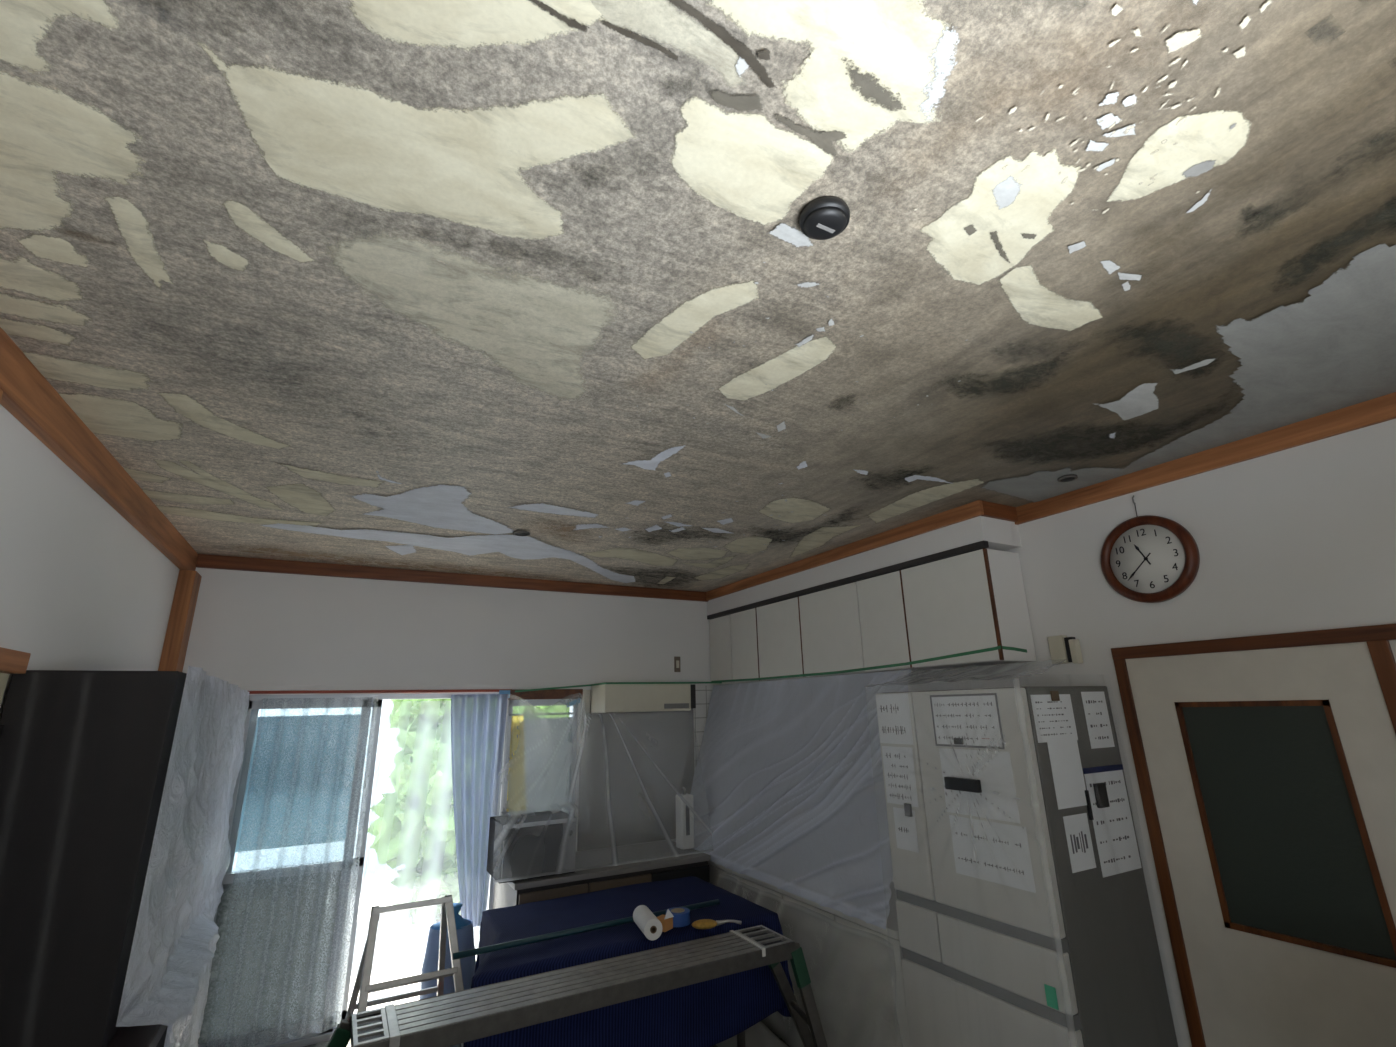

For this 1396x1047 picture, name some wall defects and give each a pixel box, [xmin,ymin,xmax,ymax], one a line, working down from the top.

crack [529,0,678,60]
crack [669,0,776,88]
peeling [919,27,960,120]
peeling [1059,25,1201,183]
peeling [769,223,813,247]
damp [1280,197,1396,286]
damp [950,345,1062,397]
damp [1119,322,1217,376]
peeling [981,243,1396,502]
damp [996,405,1224,463]
peeling [260,471,636,583]
damp [761,514,847,543]